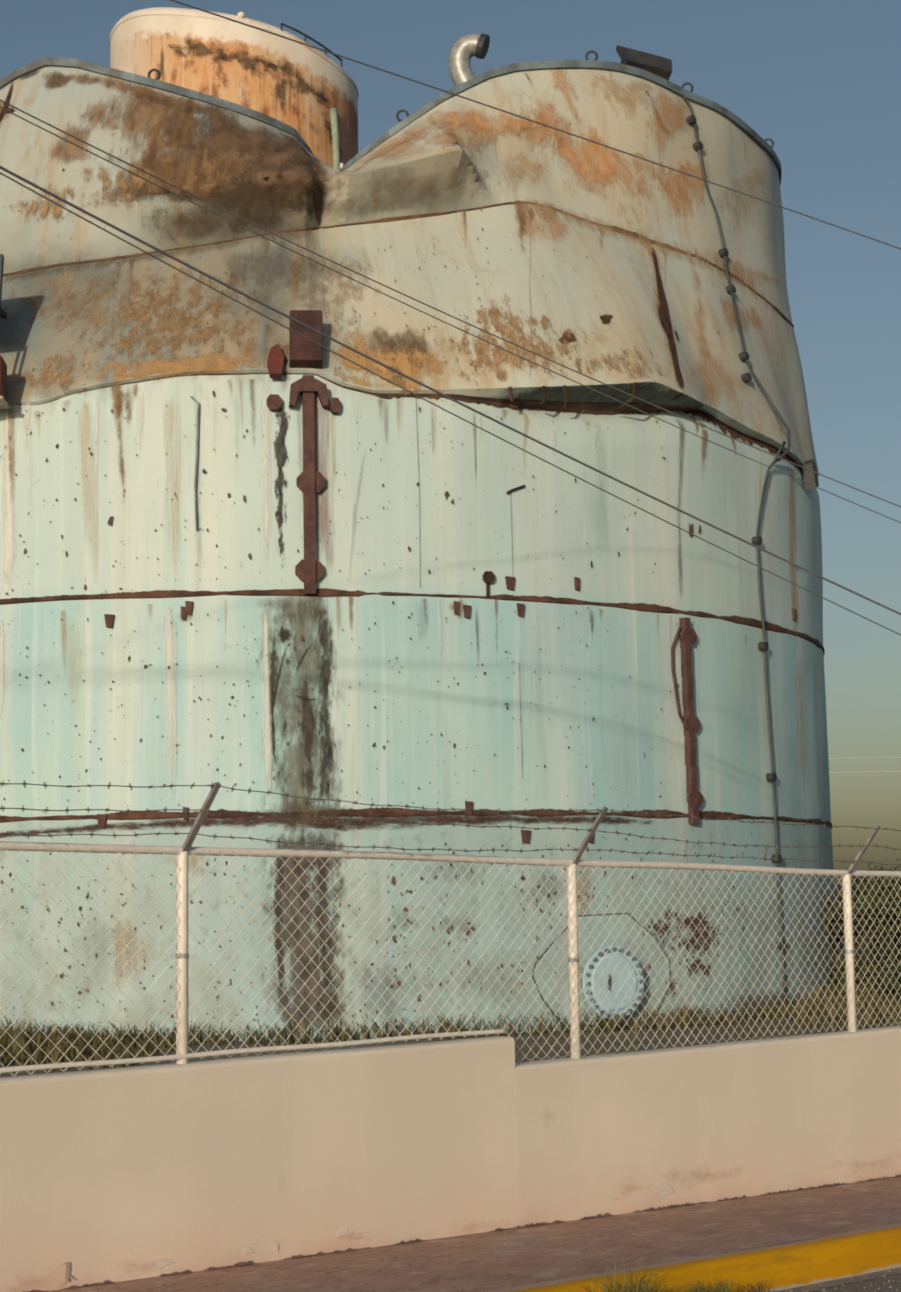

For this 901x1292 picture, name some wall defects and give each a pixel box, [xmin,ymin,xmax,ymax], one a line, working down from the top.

rust [355,70,707,212]
rust [20,259,269,483]
rust [334,299,801,609]
rust [516,200,765,326]
water stain [264,600,343,1028]
rust [648,902,721,996]